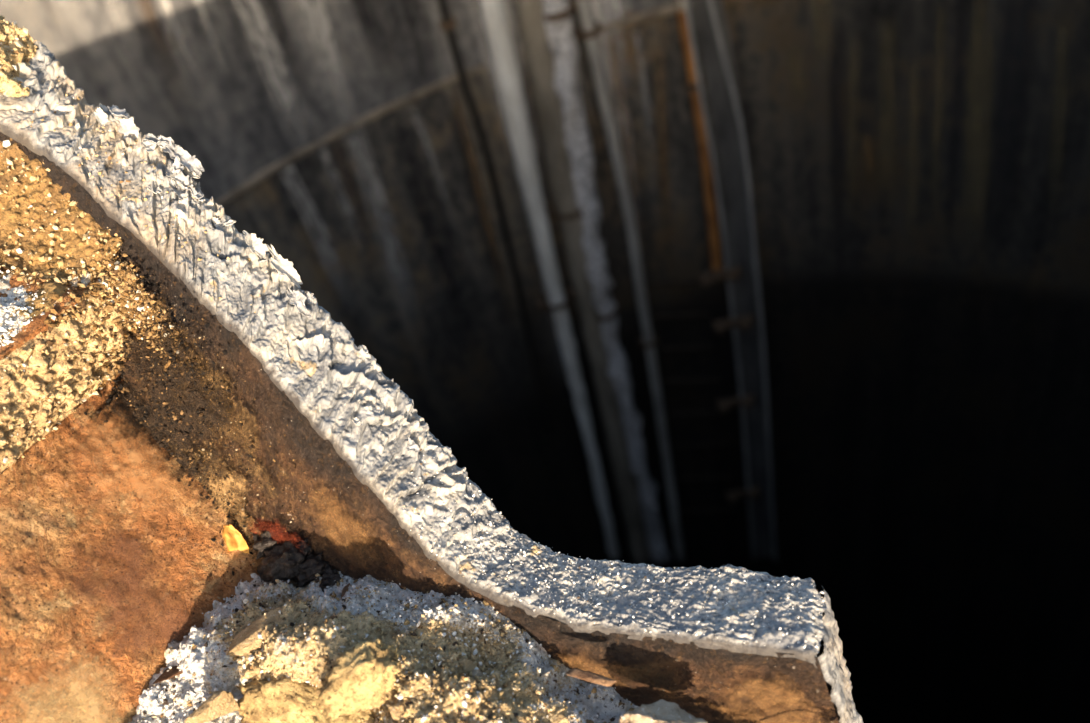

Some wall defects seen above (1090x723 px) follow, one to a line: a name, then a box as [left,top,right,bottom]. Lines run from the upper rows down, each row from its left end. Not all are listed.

rust [88,416,168,507]
rust [74,531,190,654]